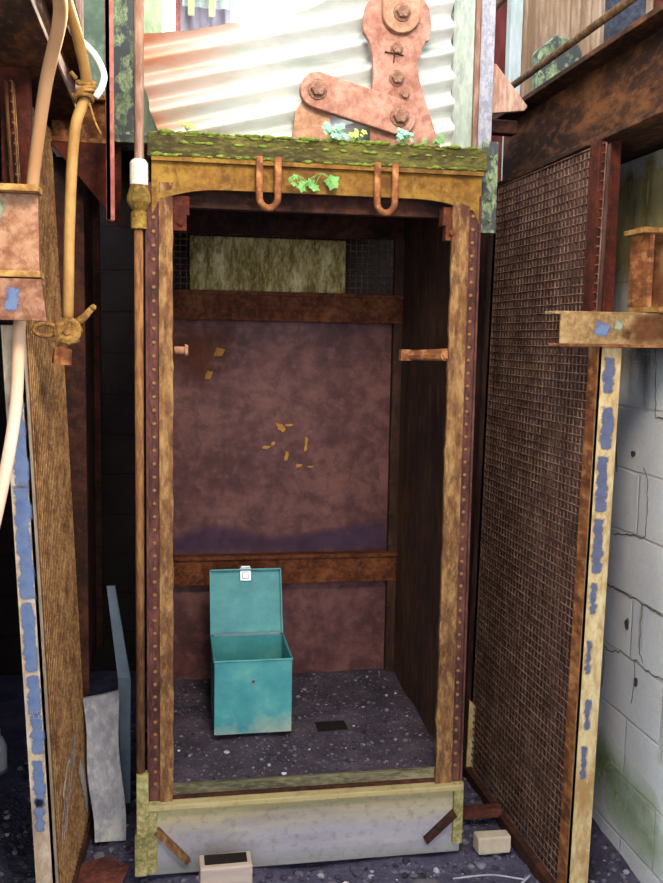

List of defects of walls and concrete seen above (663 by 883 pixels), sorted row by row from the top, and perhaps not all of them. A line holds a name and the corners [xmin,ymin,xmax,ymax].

peeling [4,287,20,310]
mould [595,754,608,777]